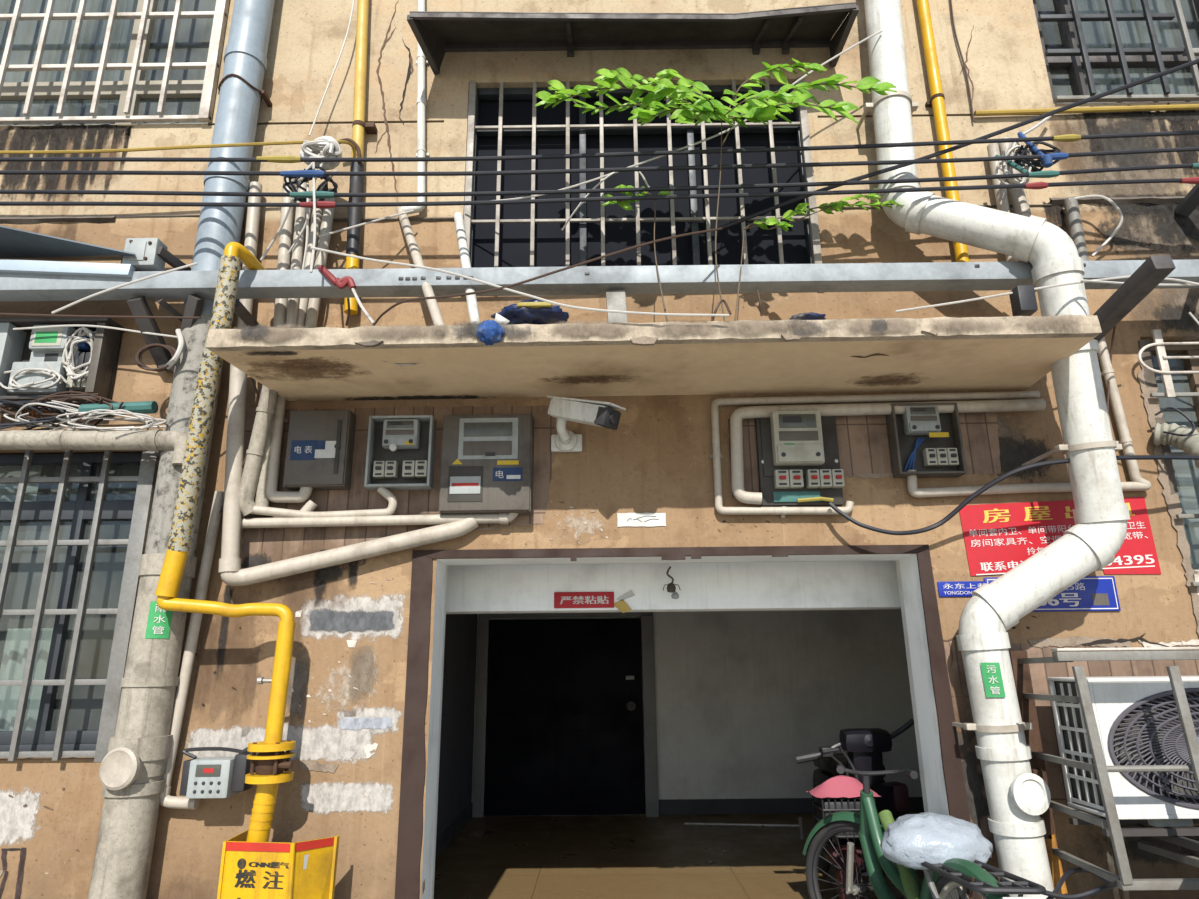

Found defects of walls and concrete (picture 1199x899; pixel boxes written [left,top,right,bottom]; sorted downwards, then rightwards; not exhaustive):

crack [375,3,414,193]
water stain [0,123,132,201]
water stain [1043,200,1067,230]
water stain [1055,103,1199,260]
peeling [282,579,405,814]
peeling [187,726,266,759]
water stain [0,847,26,899]